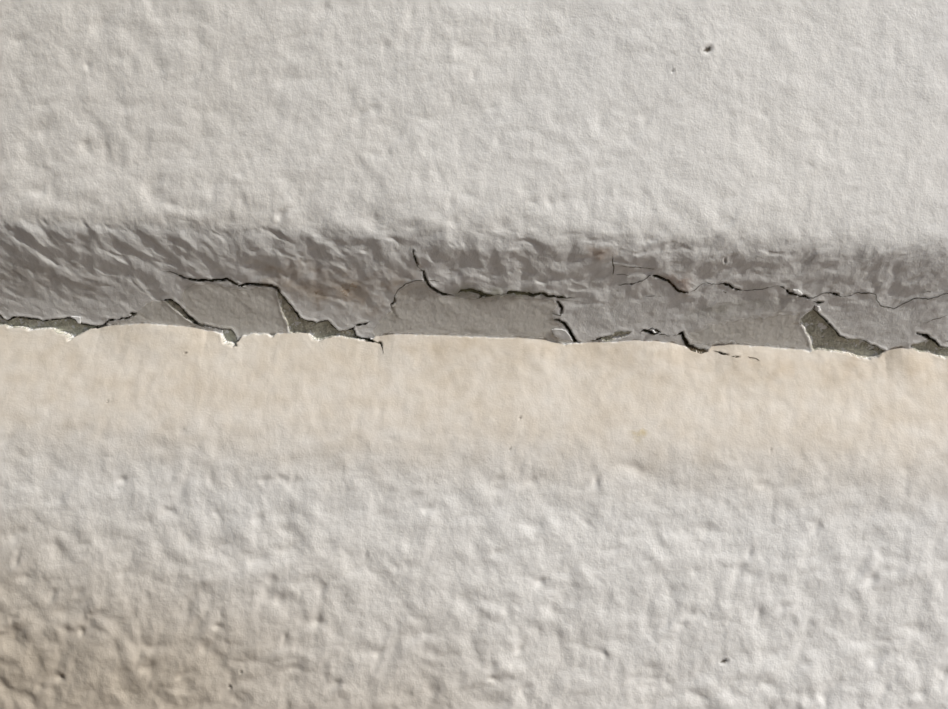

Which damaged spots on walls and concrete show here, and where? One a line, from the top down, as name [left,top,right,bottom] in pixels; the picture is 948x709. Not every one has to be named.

spalling [0,316,106,339]
spalling [166,300,194,322]
spalling [223,329,238,346]
crack [163,271,384,353]
spalling [277,292,361,340]
crack [390,250,758,360]
spalling [601,331,630,341]
crack [612,258,948,350]
spalling [800,310,884,358]
spalling [911,339,948,358]